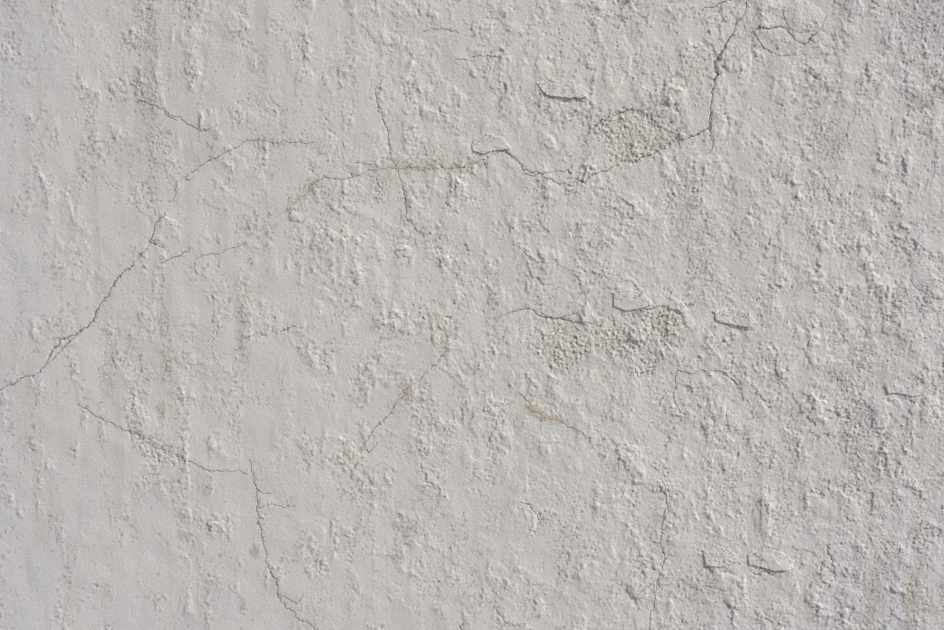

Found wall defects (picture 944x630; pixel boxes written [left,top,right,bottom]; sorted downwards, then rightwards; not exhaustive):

crack [284,0,825,221]
crack [1,139,309,390]
crack [362,315,451,452]
crack [81,405,316,630]